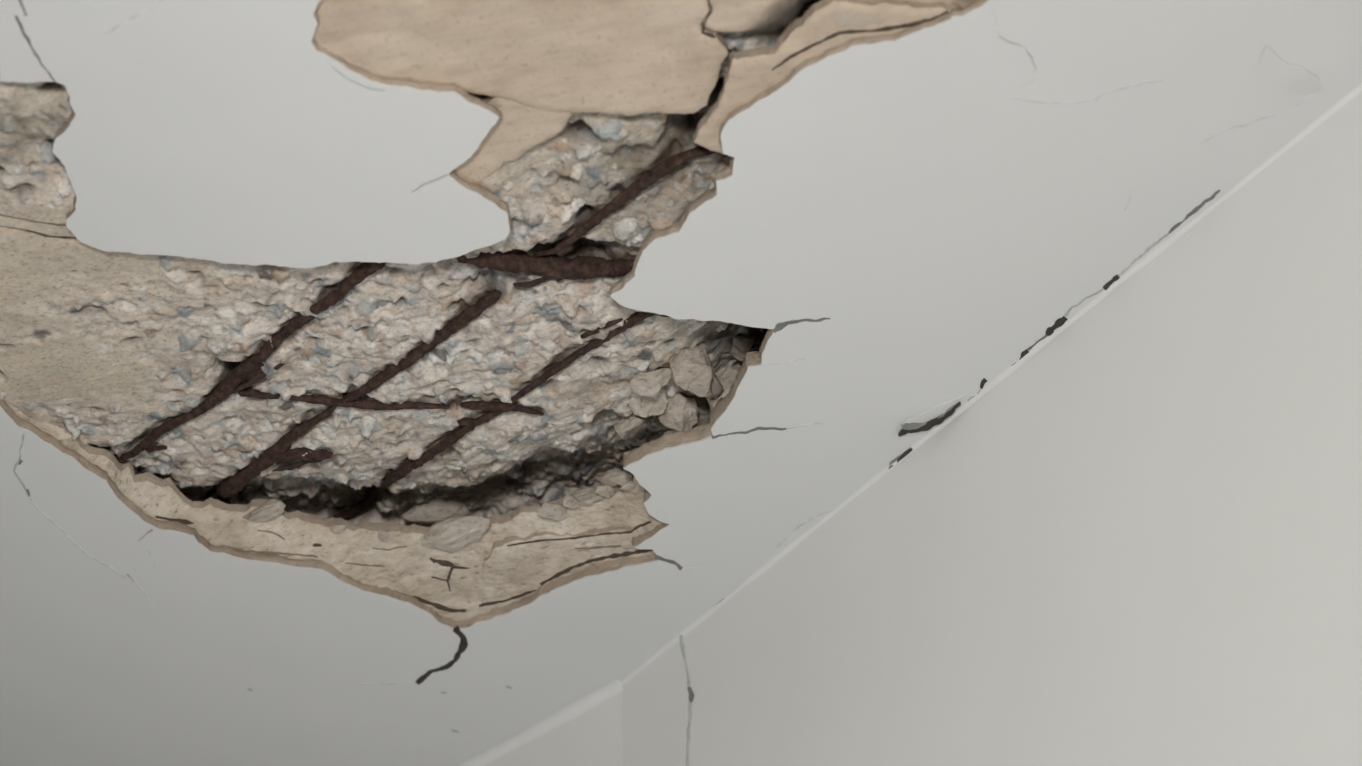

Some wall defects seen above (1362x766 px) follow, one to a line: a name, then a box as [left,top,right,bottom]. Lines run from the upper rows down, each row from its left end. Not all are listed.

corrosion [117,146,717,520]
spalling [0,0,989,629]
crack [967,190,1220,401]
crack [235,521,705,685]
crack [679,635,694,766]